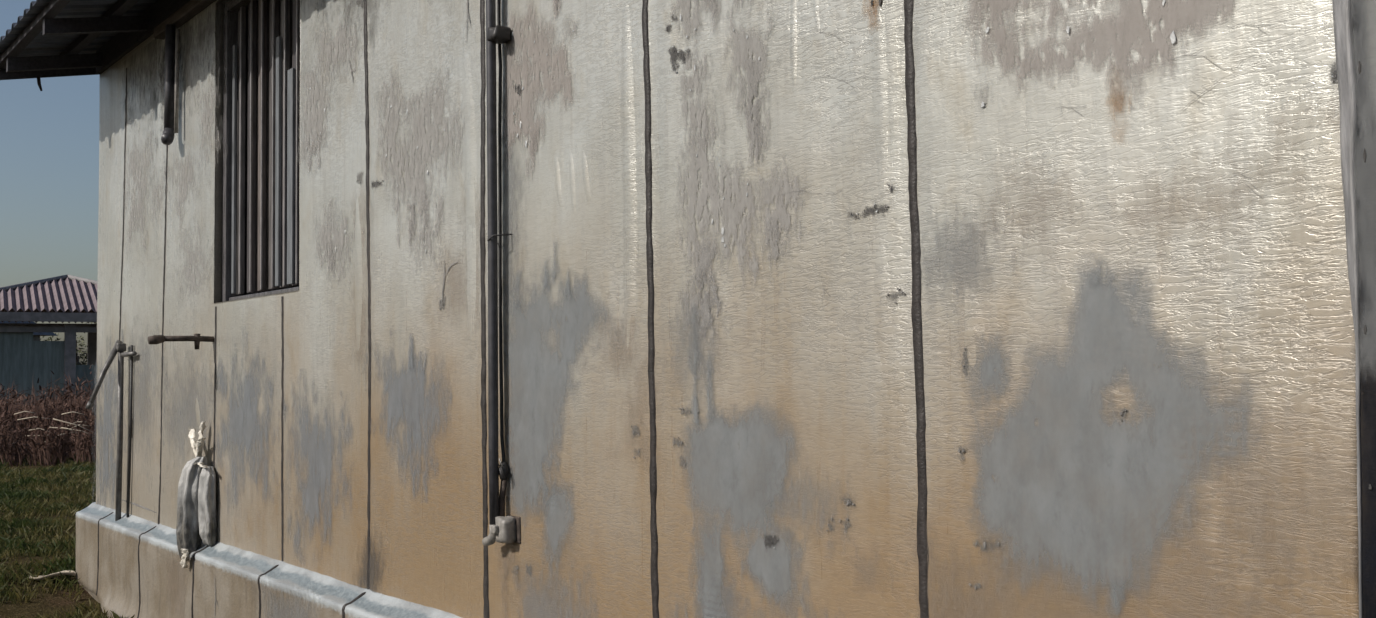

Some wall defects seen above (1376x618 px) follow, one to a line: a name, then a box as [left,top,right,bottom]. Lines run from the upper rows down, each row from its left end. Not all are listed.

peeling [969,0,1234,85]
leakage [507,251,605,561]
leakage [687,347,795,618]
leakage [977,269,1246,608]